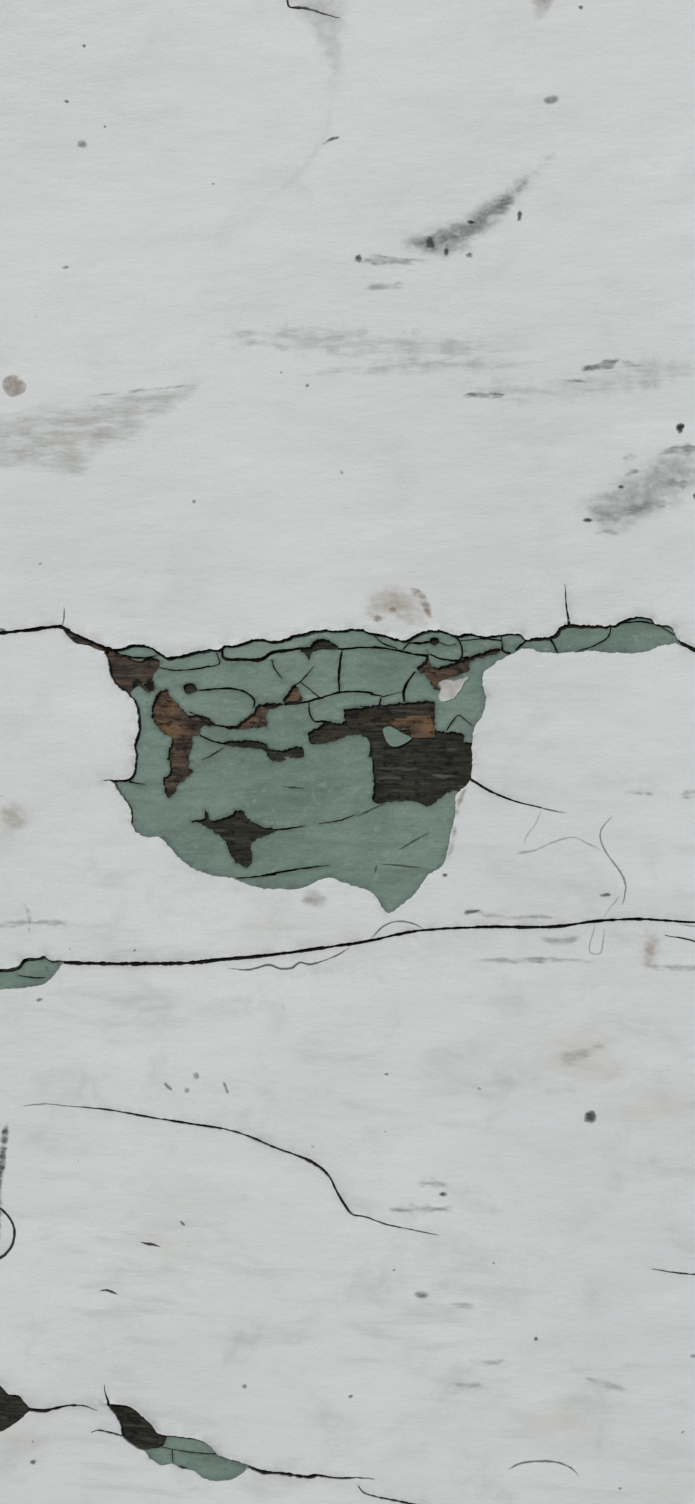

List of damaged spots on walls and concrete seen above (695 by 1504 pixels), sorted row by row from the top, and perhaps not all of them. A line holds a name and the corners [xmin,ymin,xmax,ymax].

crack [0,625,70,635]
peeling [58,616,681,913]
crack [63,917,695,971]
peeling [0,956,64,990]
crack [57,1104,428,1233]
peeling [0,1386,363,1481]
crack [360,1488,415,1504]